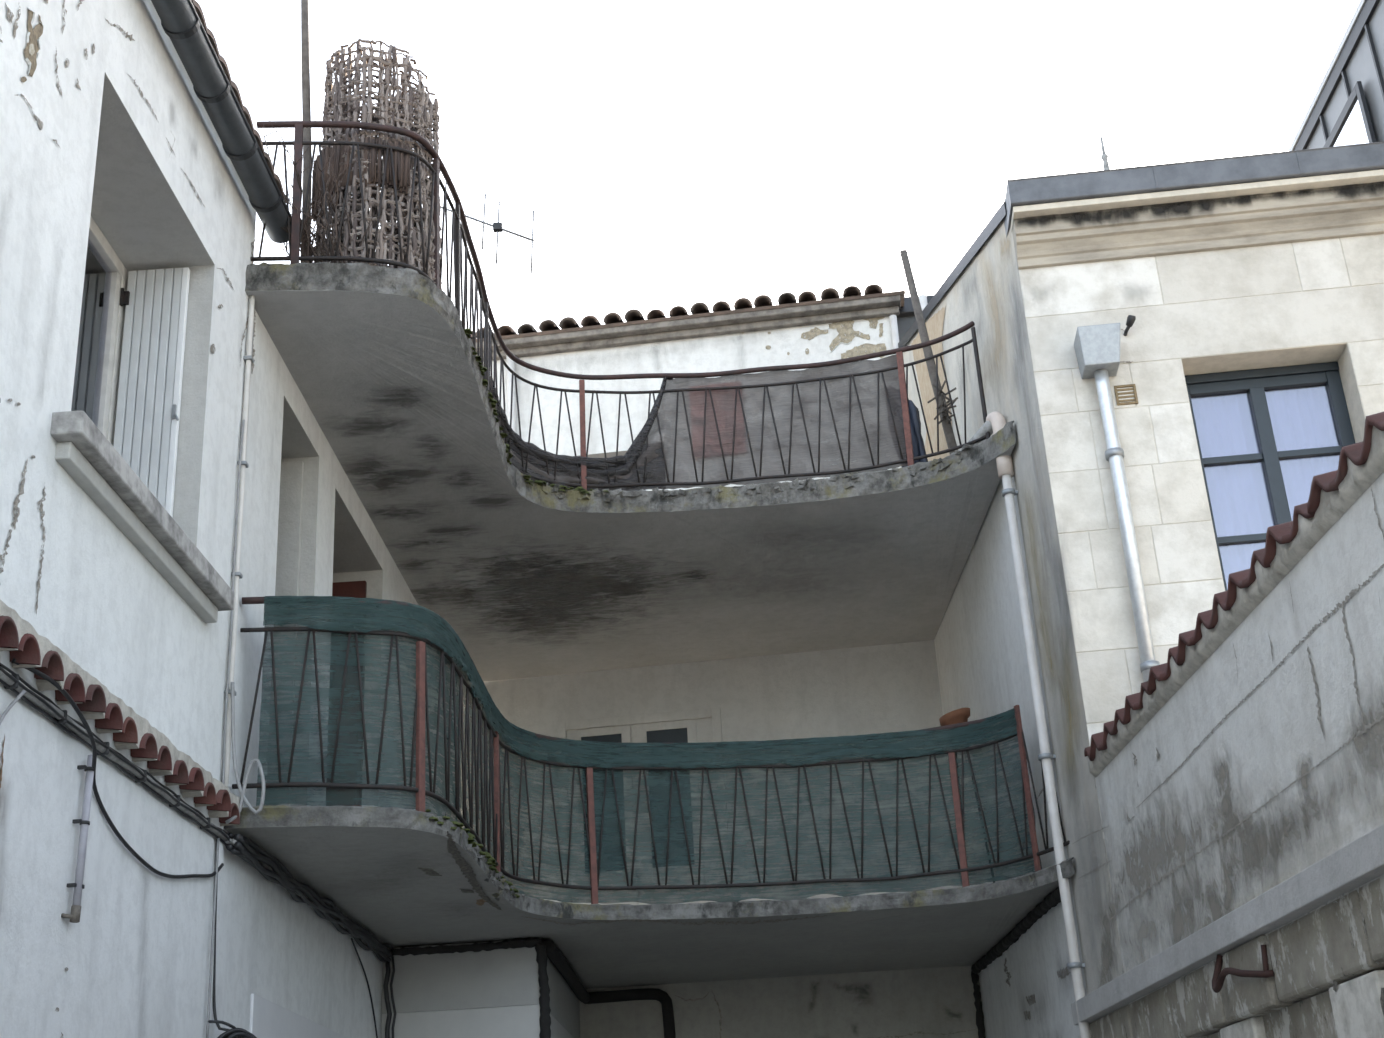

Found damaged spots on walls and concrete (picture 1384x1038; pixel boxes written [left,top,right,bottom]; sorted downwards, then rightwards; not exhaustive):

peeling [0,0,48,83]
damp [1030,182,1384,224]
peeling [541,307,974,503]
damp [348,440,440,490]
damp [421,560,648,633]
crack [1073,489,1384,920]
damp [1353,701,1384,767]
damp [1101,760,1333,983]